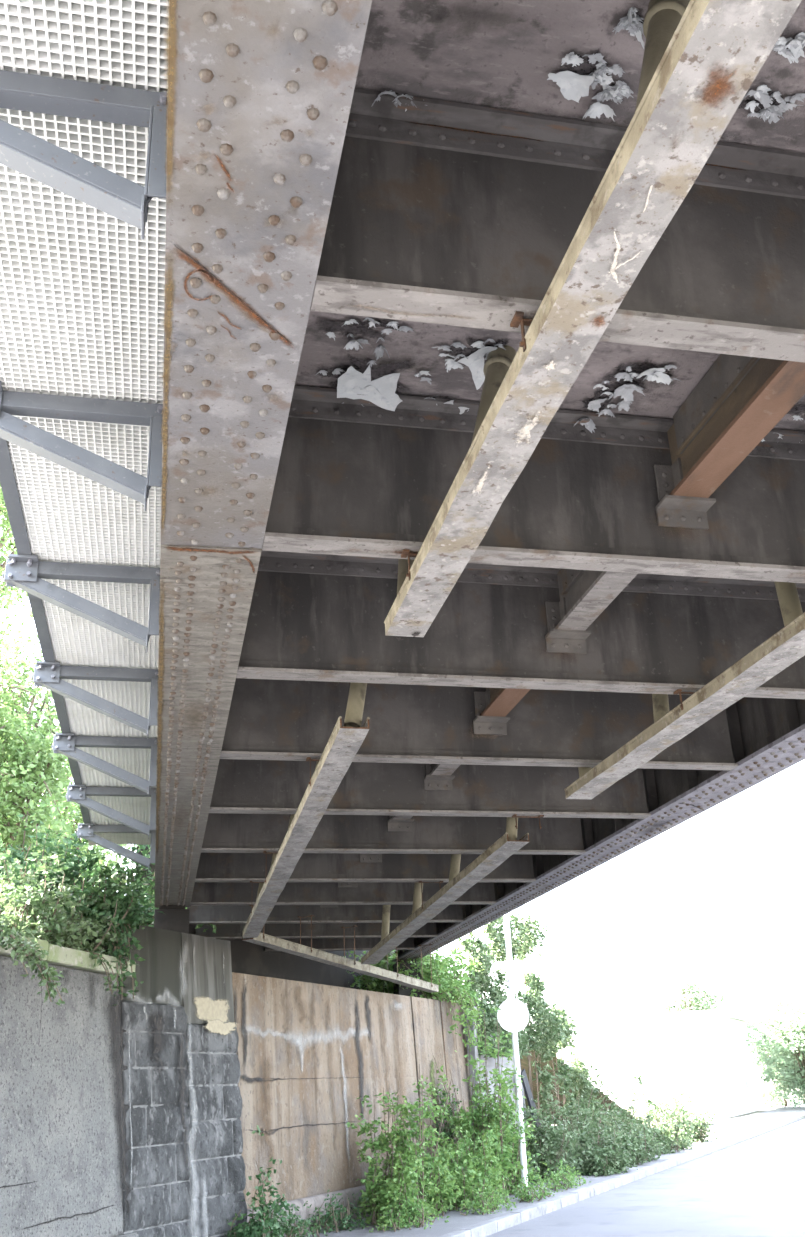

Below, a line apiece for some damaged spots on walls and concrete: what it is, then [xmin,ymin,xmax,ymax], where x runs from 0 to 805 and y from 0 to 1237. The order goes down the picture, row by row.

peeling [612,7,644,49]
rust [165,0,177,191]
peeling [547,51,634,122]
rust [703,69,734,107]
rust [160,264,174,528]
peeling [316,317,470,414]
peeling [431,338,509,390]
peeling [573,362,680,433]
rust [156,590,164,853]
spalling [194,997,236,1035]